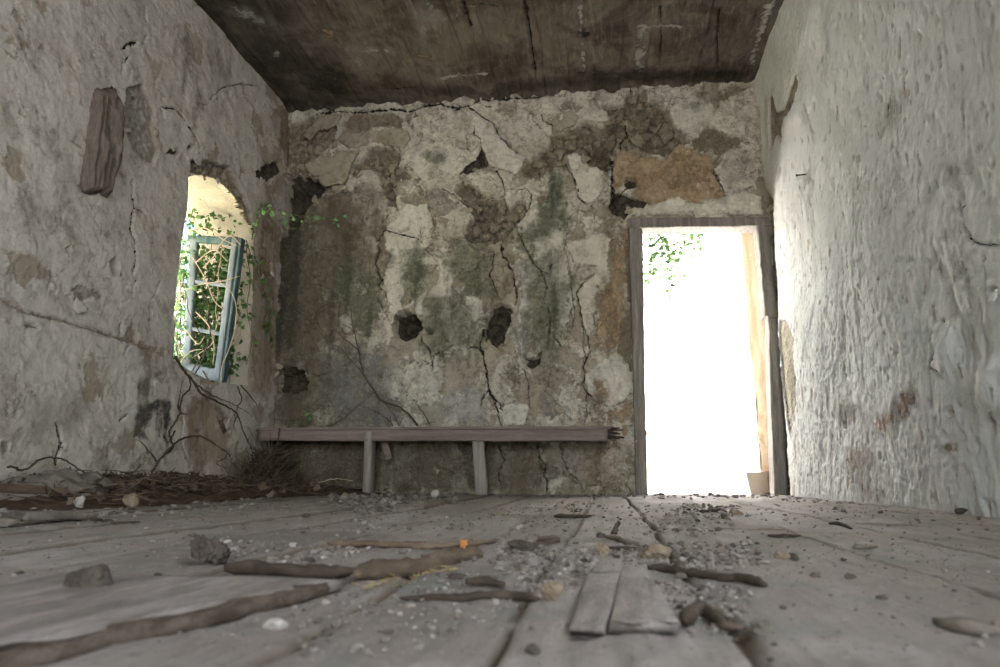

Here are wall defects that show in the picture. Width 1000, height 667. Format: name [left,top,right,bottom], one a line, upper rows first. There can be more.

spalling [766,74,798,155]
crack [565,125,628,210]
spalling [255,87,764,349]
crack [374,218,434,311]
crack [421,232,607,426]
water stain [134,377,171,437]
crack [537,445,582,493]